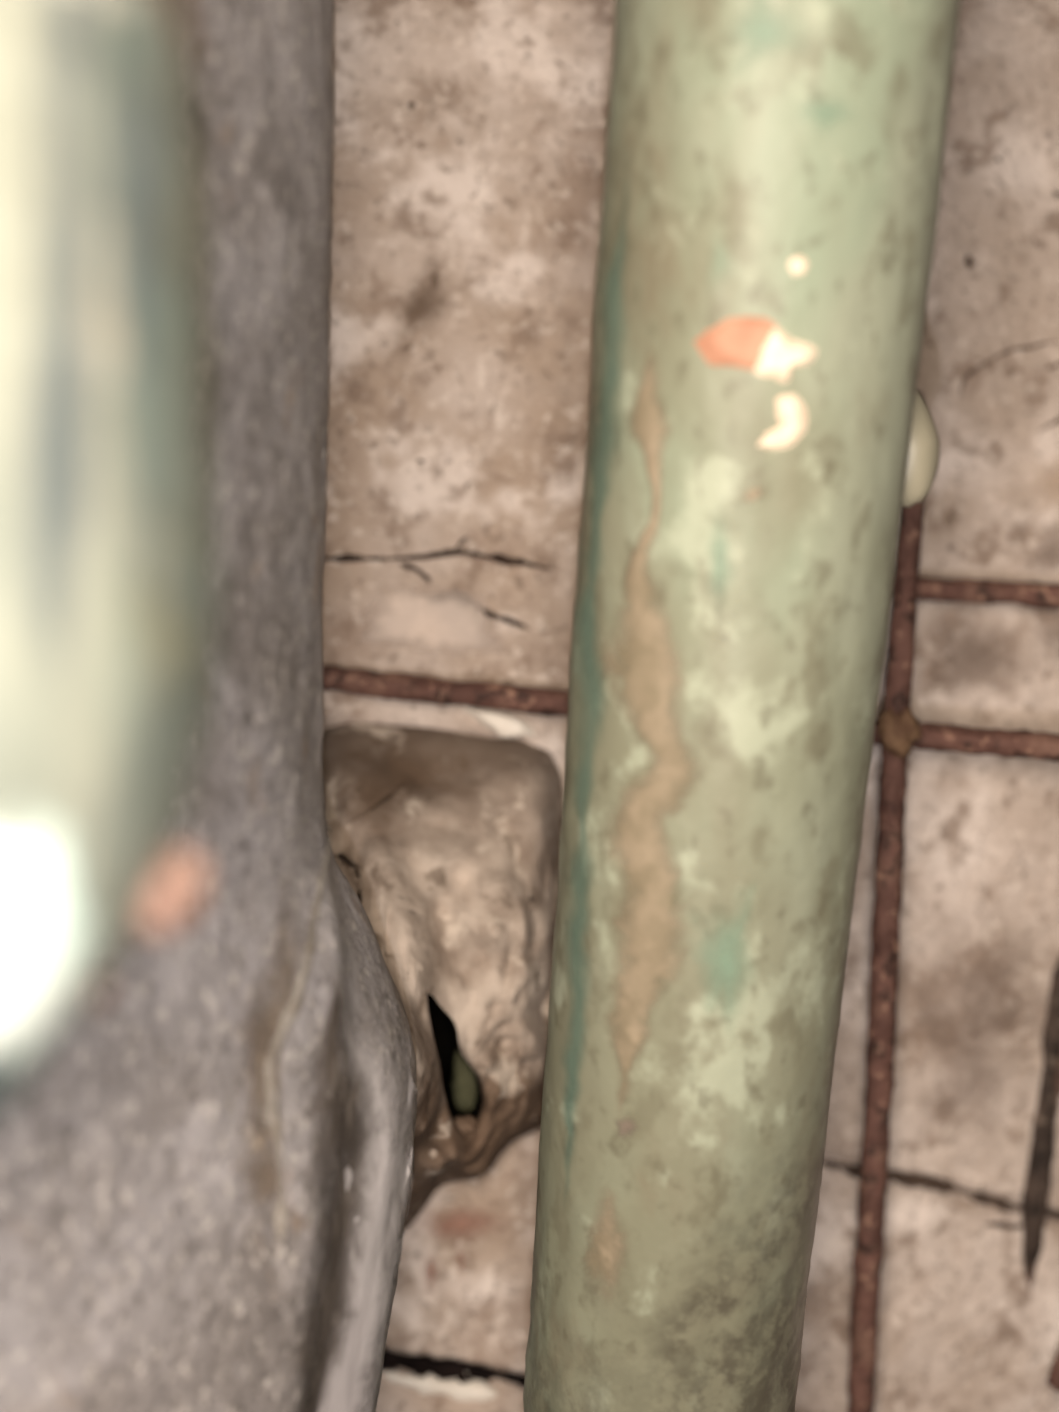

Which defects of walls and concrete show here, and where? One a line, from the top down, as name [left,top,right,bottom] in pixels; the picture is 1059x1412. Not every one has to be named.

crack [324,537,553,629]